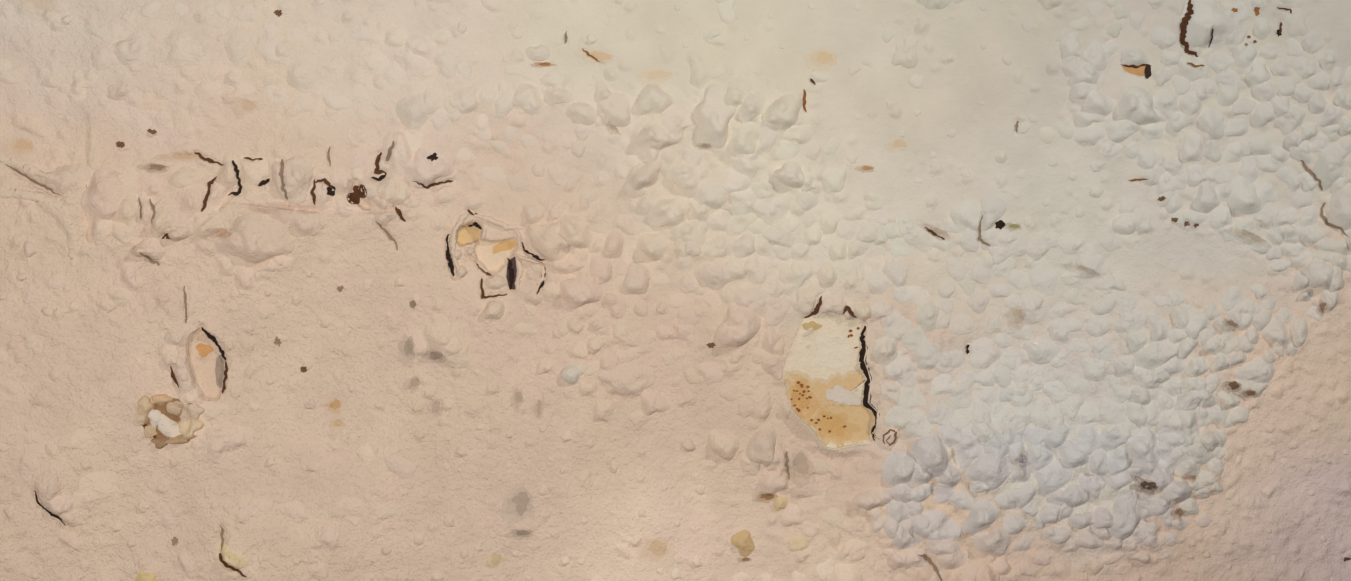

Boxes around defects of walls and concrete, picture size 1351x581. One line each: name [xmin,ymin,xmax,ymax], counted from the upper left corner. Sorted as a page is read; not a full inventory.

peeling [485,257,517,290]
flaking render [783,314,900,451]